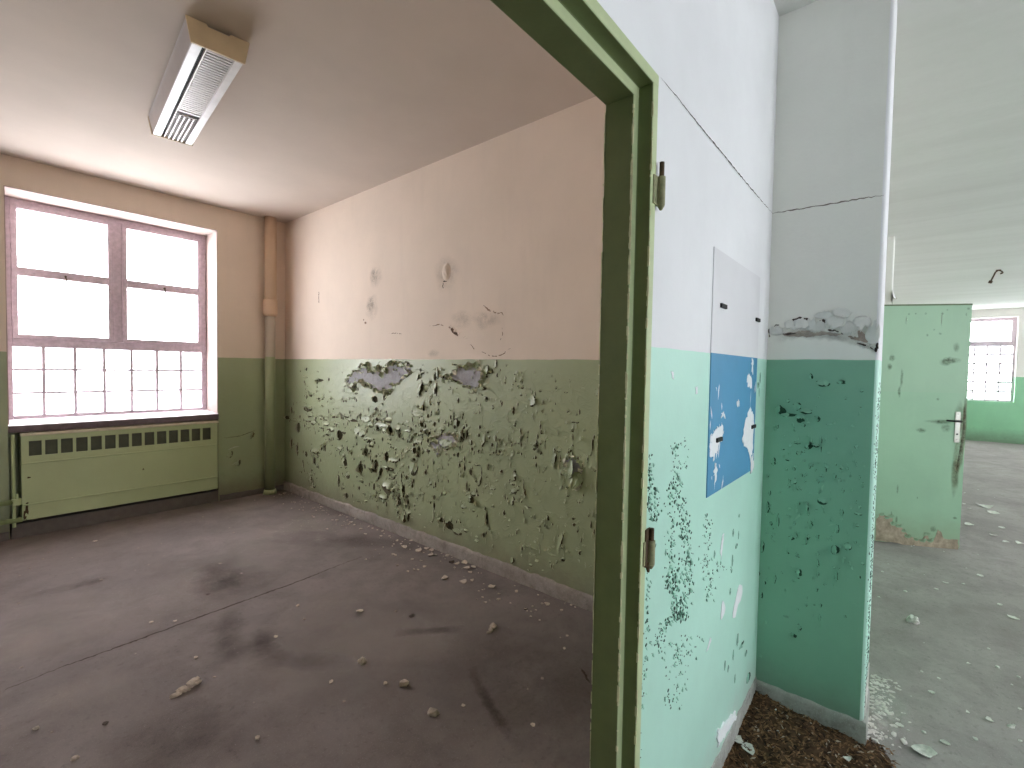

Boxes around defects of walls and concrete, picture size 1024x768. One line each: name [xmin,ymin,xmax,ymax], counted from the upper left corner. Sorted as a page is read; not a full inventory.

crack [661,78,883,214]
spalling [284,359,599,571]
peeling [641,437,743,709]
spalling [716,710,743,747]
peeling [724,634,763,684]
peeling [759,374,934,716]